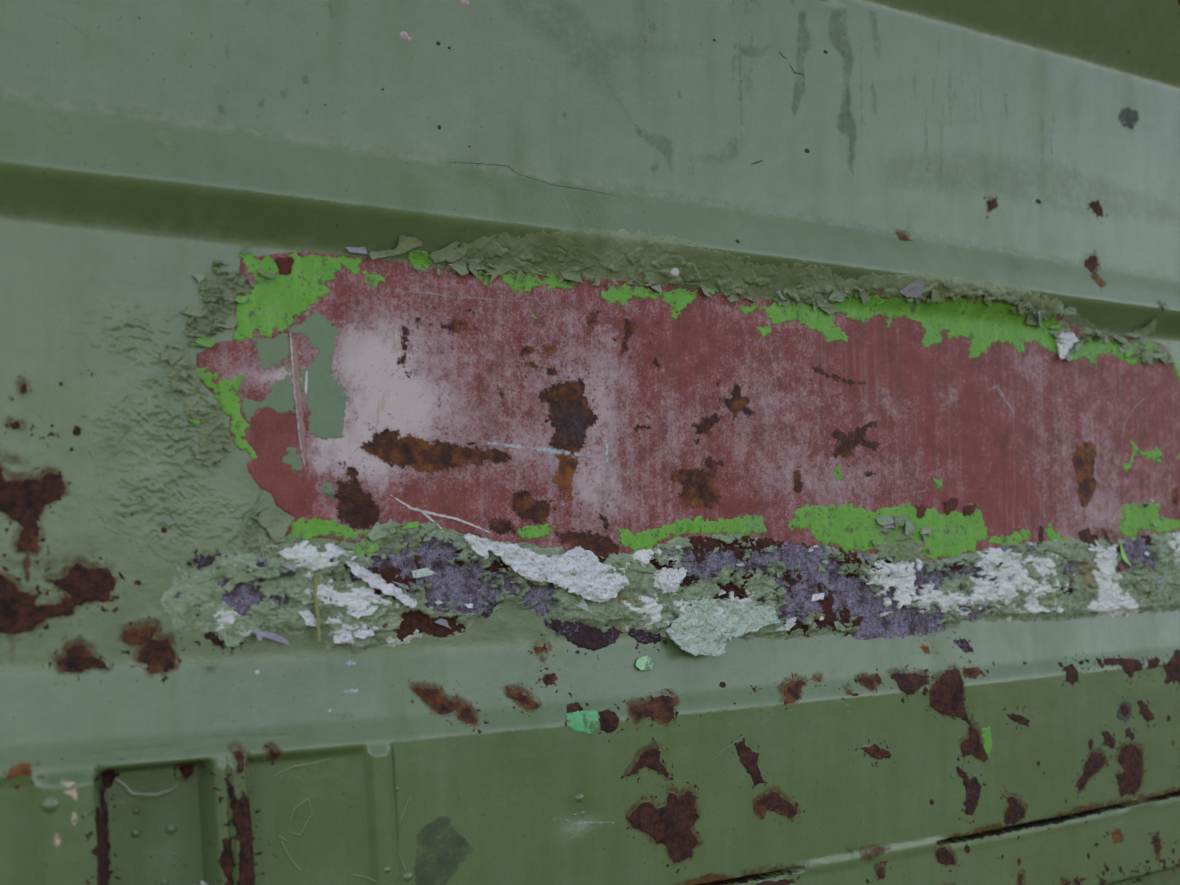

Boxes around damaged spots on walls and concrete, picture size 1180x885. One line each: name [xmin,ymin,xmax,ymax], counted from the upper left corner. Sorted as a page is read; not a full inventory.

corrosion [1,416,59,448]
corrosion [82,759,123,885]
corrosion [0,458,258,684]
corrosion [163,740,287,885]
peeling [219,629,245,647]
corrosion [403,679,489,734]
corrosion [325,334,621,563]
corrosion [499,619,805,885]
peeling [160,227,1180,608]
corrosion [749,631,1180,885]
corrosion [1068,432,1102,507]
corrosion [1076,524,1100,544]